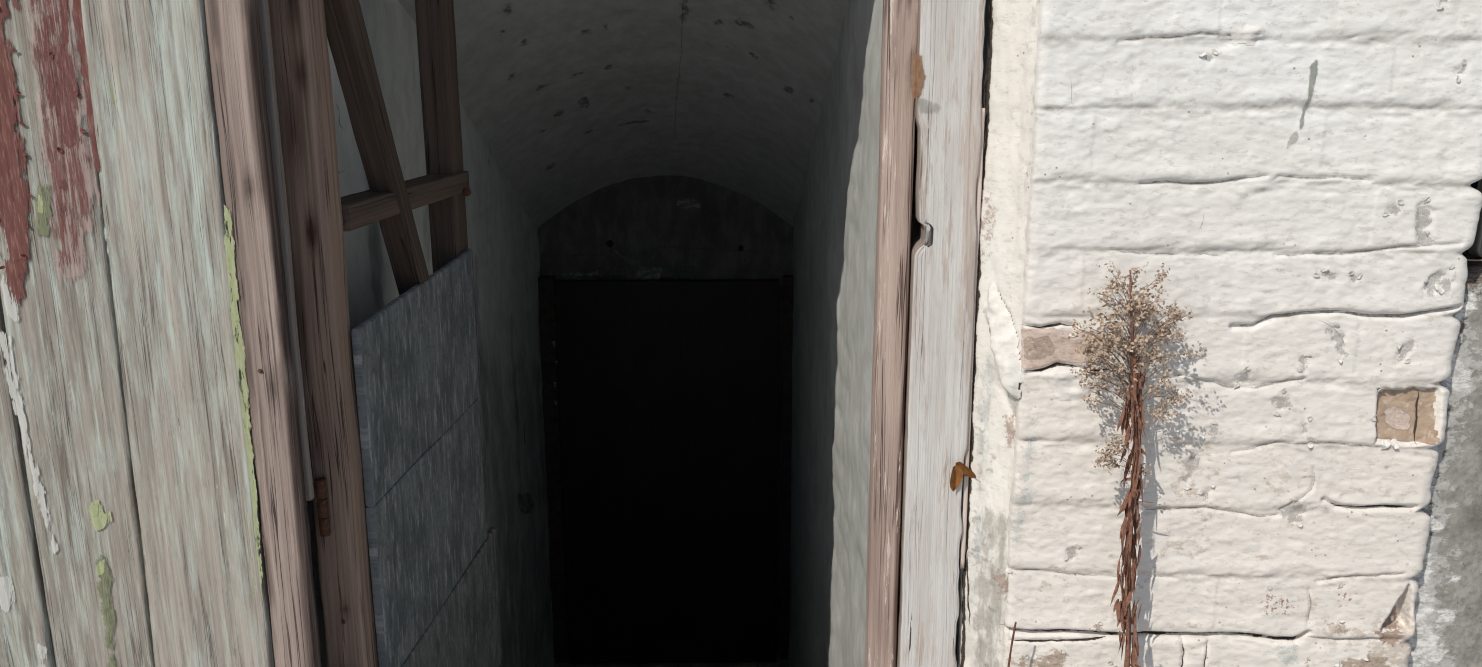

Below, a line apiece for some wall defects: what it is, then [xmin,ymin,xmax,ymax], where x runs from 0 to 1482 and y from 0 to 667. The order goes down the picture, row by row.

peeling [0,0,112,554]
spalling [1020,328,1112,369]
peeling [1397,340,1414,363]
spalling [1371,388,1440,449]
peeling [0,576,19,613]